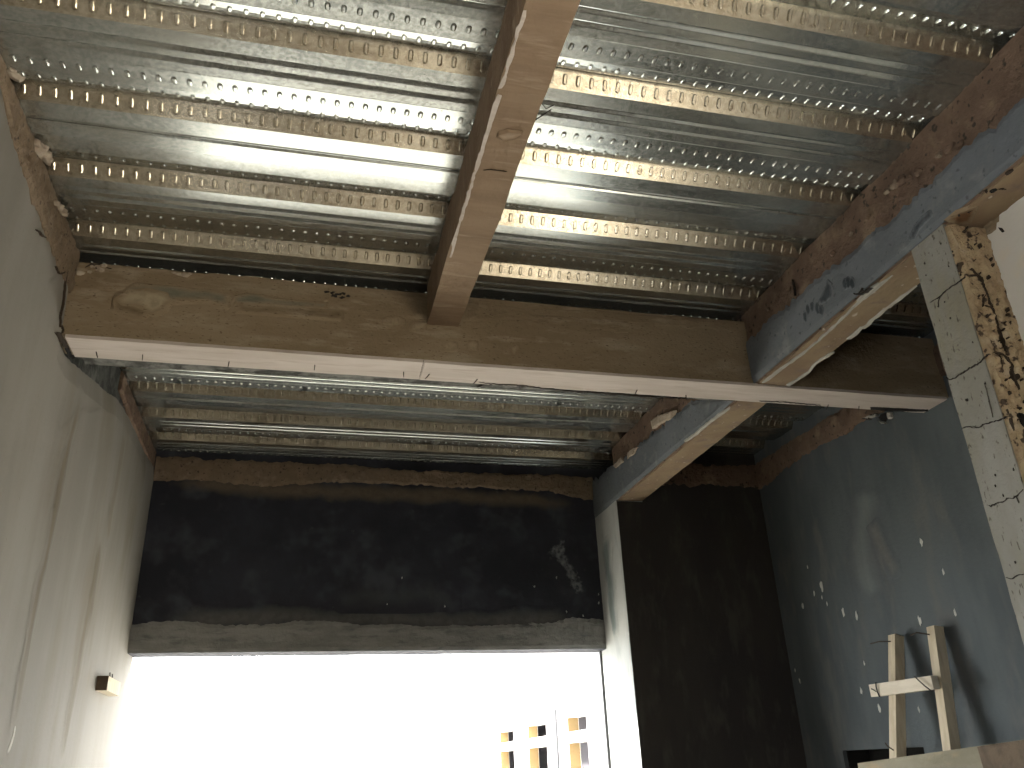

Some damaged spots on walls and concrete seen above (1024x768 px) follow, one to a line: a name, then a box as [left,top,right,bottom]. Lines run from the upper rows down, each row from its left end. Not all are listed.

peeling [762,275,893,386]
peeling [846,262,927,340]
crack [930,268,1020,429]
peeling [684,406,730,442]